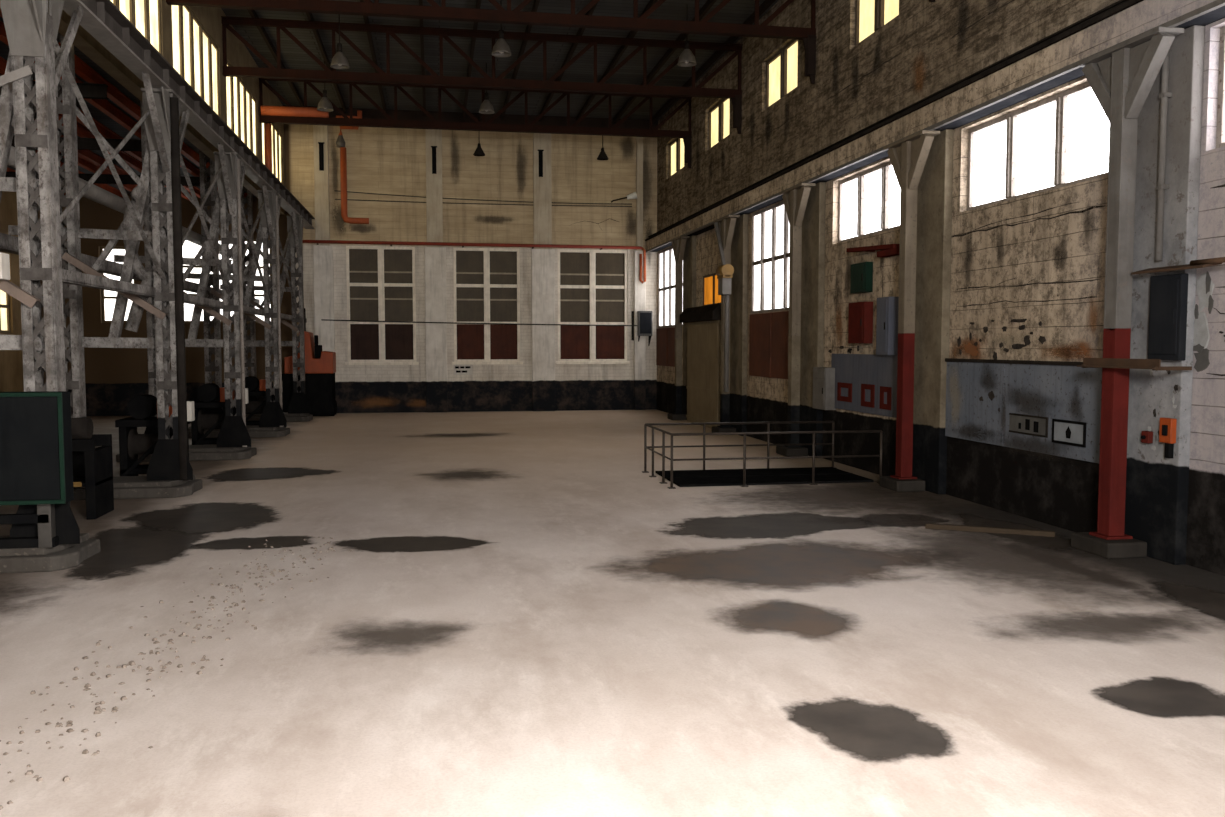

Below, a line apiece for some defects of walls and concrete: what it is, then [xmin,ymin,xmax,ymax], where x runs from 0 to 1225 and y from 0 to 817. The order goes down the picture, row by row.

leakage [192,536,312,550]
leakage [335,536,489,552]
leakage [1093,677,1225,717]
leakage [788,698,952,762]